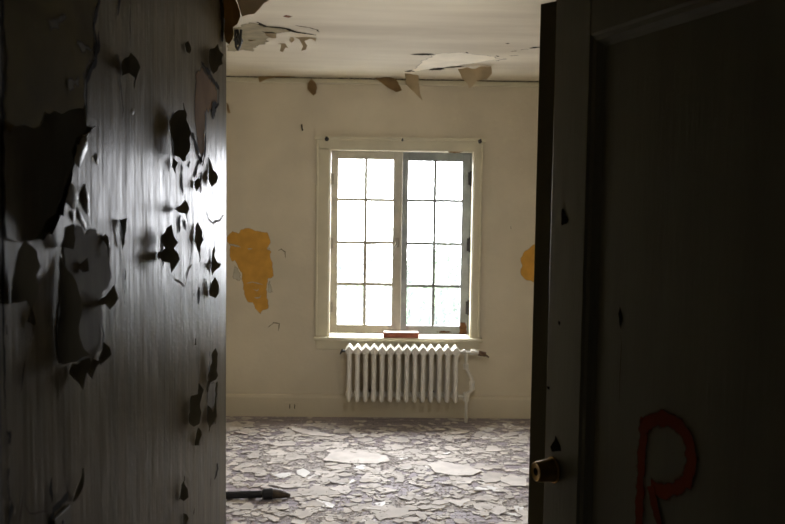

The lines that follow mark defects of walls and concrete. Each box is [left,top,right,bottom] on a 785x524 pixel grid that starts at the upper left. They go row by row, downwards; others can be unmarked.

peeling [121,53,140,88]
peeling [169,0,319,191]
peeling [376,52,503,100]
peeling [175,199,189,219]
peeling [3,106,126,389]
peeling [157,225,180,273]
peeling [194,223,203,262]
peeling [209,247,221,298]
peeling [227,228,273,314]
peeling [521,245,535,282]
peeling [179,477,188,501]